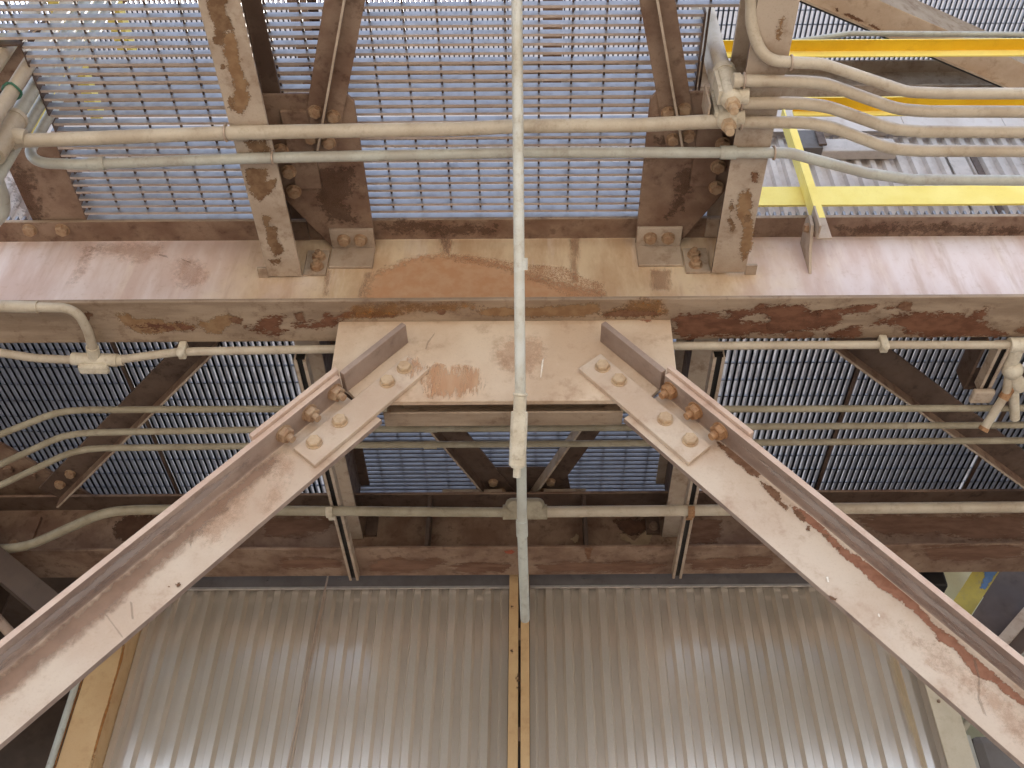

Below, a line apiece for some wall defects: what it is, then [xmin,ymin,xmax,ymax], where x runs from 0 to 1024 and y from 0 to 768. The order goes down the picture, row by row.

corrosion [345,253,605,319]
peeling [685,555,773,571]
peeling [716,441,1024,705]